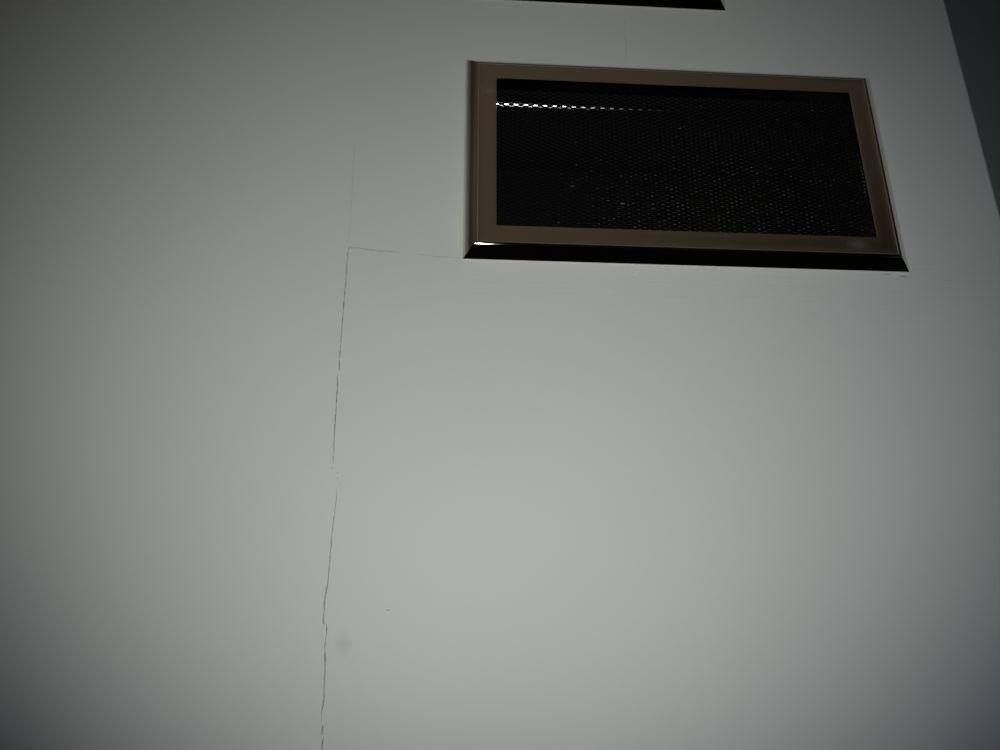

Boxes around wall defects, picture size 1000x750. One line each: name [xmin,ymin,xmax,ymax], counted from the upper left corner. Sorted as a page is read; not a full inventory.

crack [321,246,456,750]